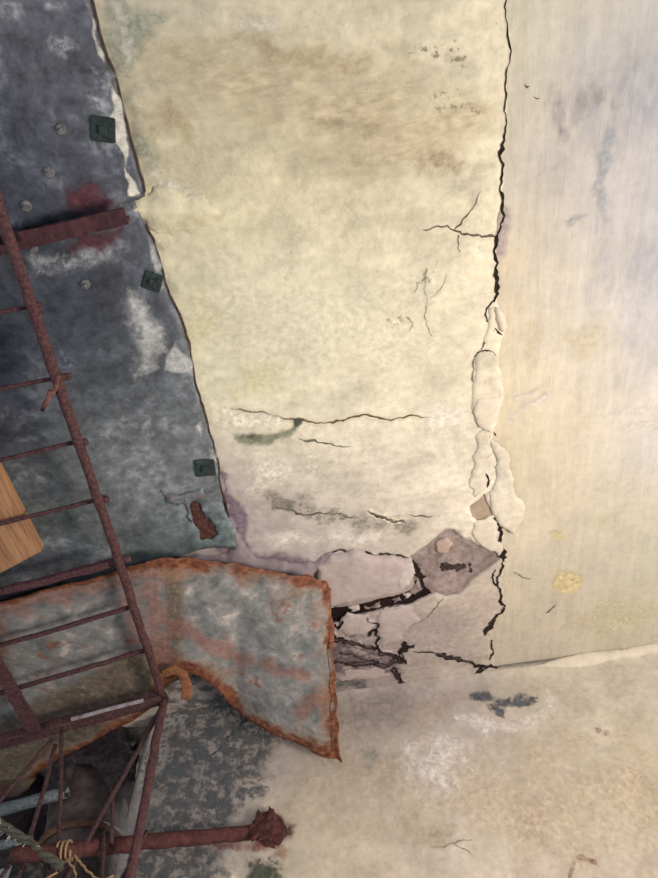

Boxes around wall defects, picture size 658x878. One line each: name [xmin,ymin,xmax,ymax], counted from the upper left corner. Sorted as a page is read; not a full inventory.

crack [422,0,539,383]
crack [407,269,447,337]
crack [230,404,446,448]
crack [333,518,529,684]